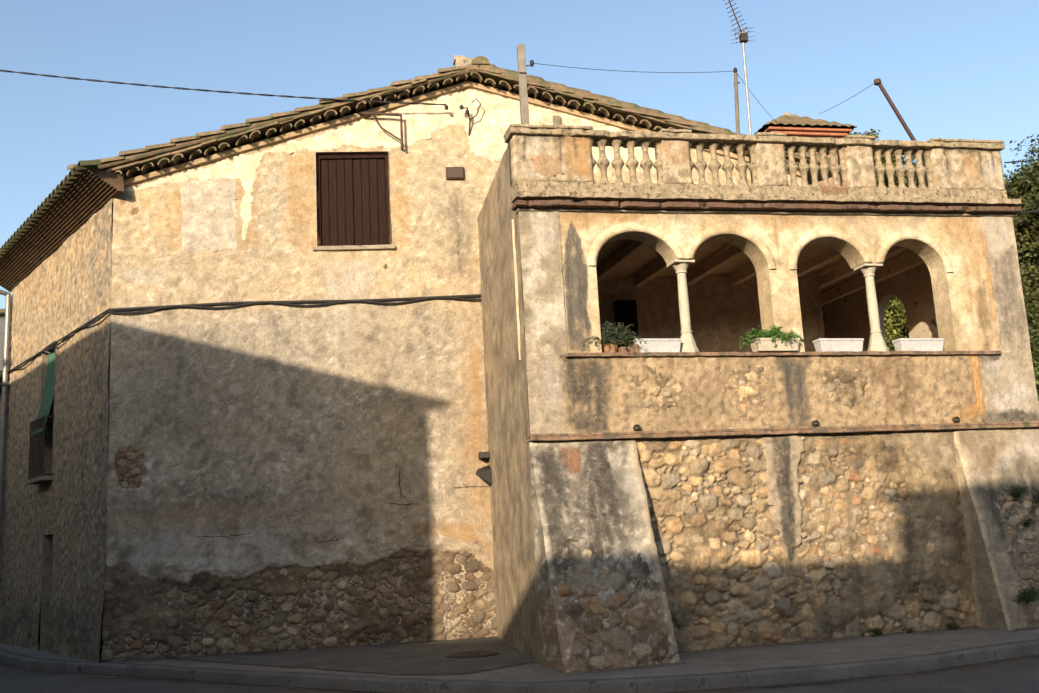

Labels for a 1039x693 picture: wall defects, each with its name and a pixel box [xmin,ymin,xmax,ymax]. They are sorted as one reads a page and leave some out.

peeling [122,89,624,241]
peeling [592,146,657,172]
water stain [530,211,644,571]
spalling [113,446,147,489]
spalling [102,534,497,662]
crack [390,471,418,506]
spalling [551,436,977,673]
water stain [774,437,795,560]